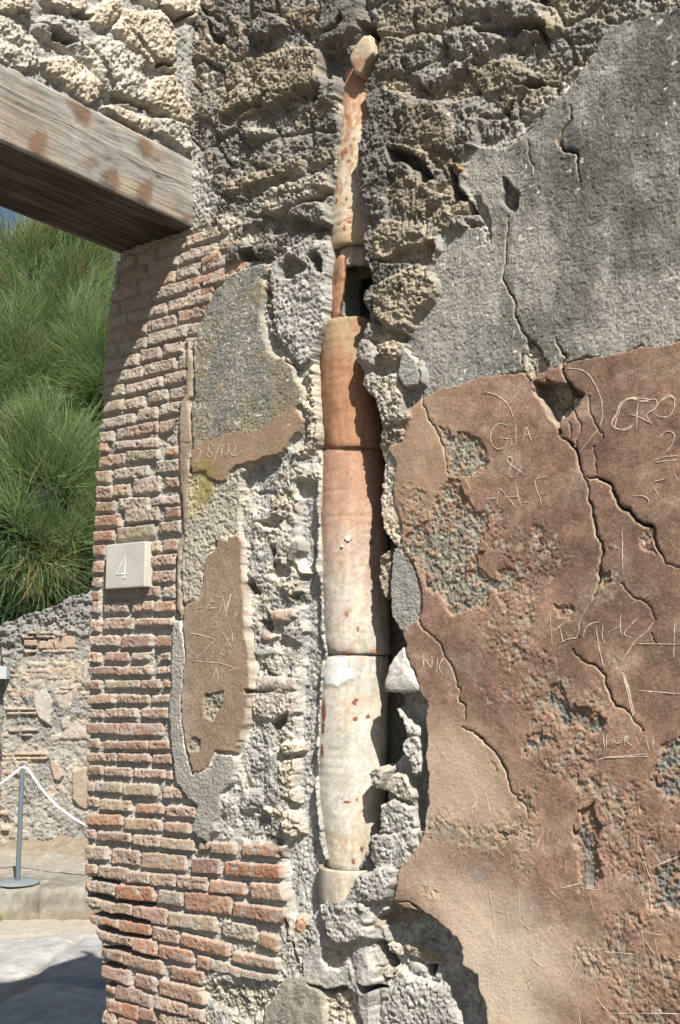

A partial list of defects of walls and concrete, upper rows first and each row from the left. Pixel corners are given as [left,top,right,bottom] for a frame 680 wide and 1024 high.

crack [503,104,582,183]
spalling [504,177,521,212]
crack [500,217,680,731]
spalling [403,426,518,616]
spalling [204,691,224,720]
crack [406,554,530,818]
spalling [573,802,604,890]